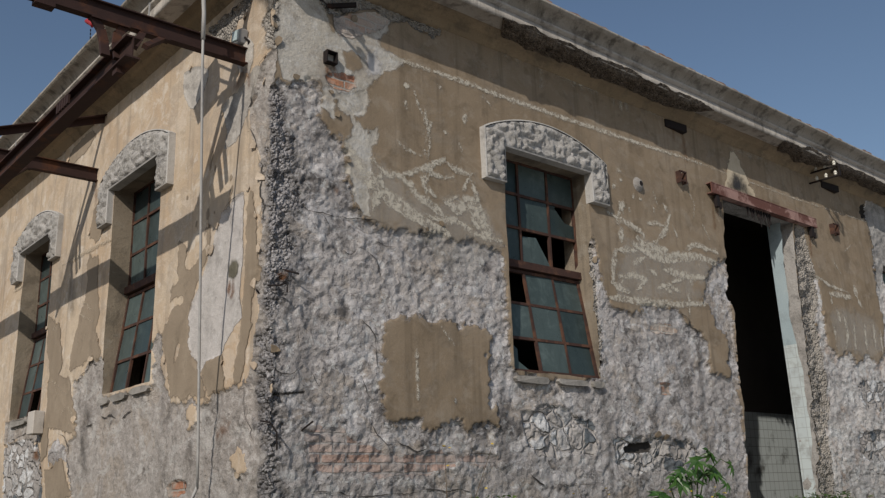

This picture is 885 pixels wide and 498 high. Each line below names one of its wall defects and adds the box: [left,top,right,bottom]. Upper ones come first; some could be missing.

flaking render [208,0,251,41]
peeling [261,0,441,94]
flaking render [2,47,749,498]
flaking render [814,249,885,498]